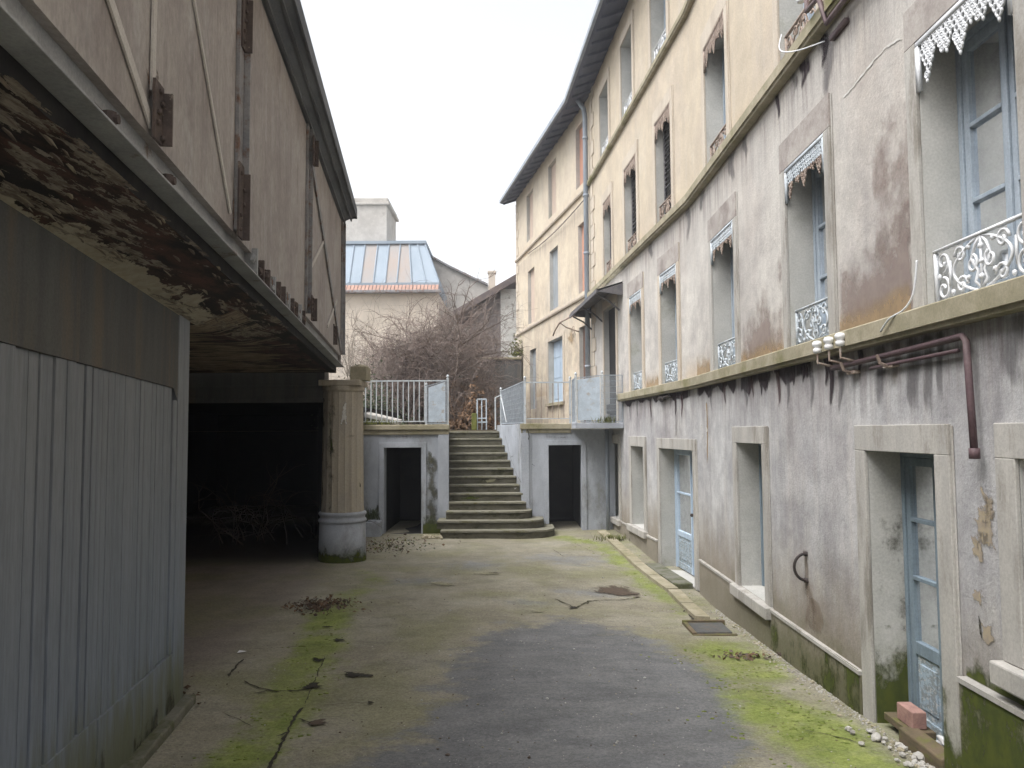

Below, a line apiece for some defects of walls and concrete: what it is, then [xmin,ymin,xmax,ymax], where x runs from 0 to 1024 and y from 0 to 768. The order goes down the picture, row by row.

peeling [0,73,318,373]
damp [840,199,912,331]
damp [625,357,834,458]
flaking render [971,487,995,562]
crack [227,656,360,768]